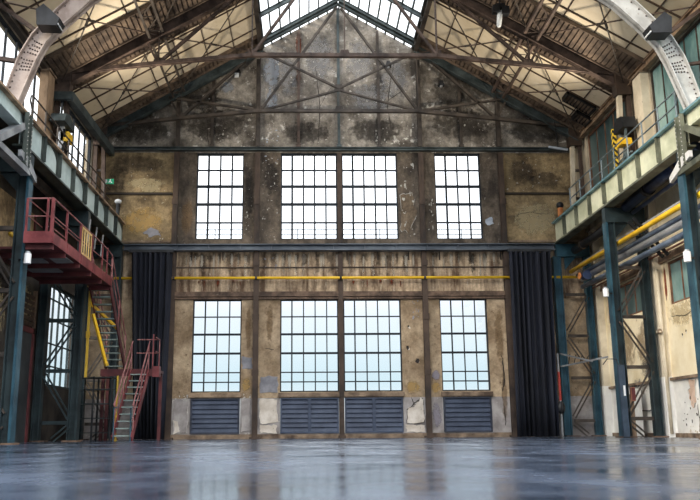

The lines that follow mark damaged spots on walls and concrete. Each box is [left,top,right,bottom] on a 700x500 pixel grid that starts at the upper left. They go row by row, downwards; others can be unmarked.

leakage [349,254,394,270]
flaking render [241,376,279,434]
flaking render [683,378,698,433]